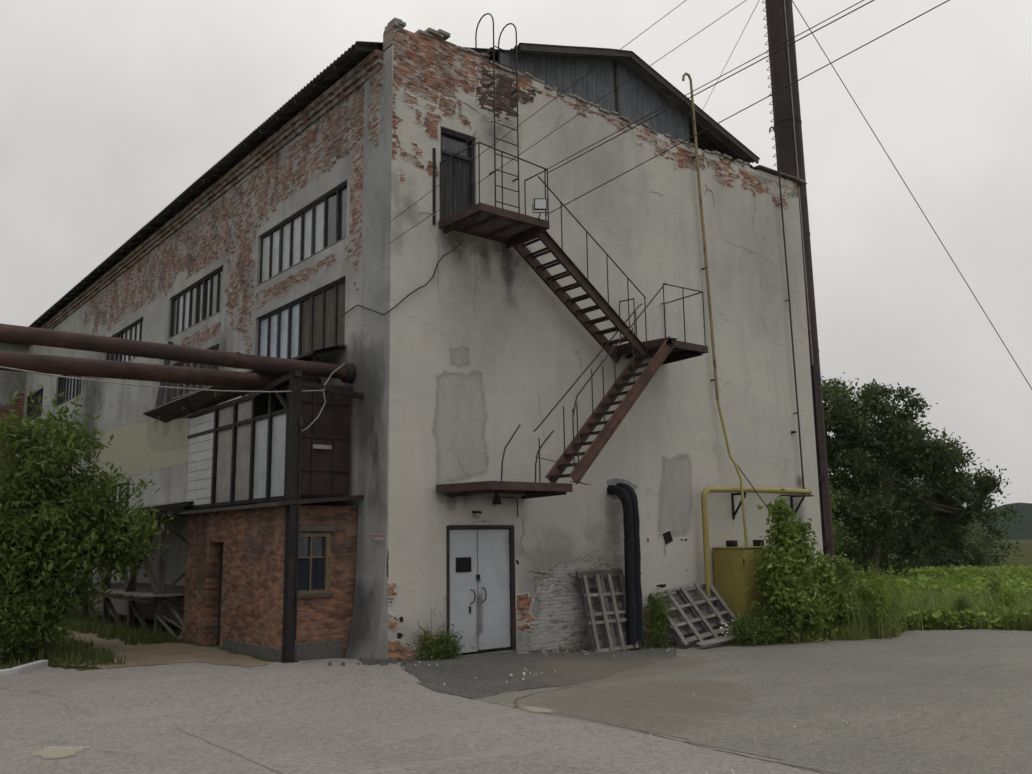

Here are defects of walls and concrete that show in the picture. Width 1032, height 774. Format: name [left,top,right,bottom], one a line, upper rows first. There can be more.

spalling [81,30,559,354]
spalling [636,131,797,210]
damp [352,351,379,437]
flaking render [515,557,617,651]
crack [174,726,283,774]